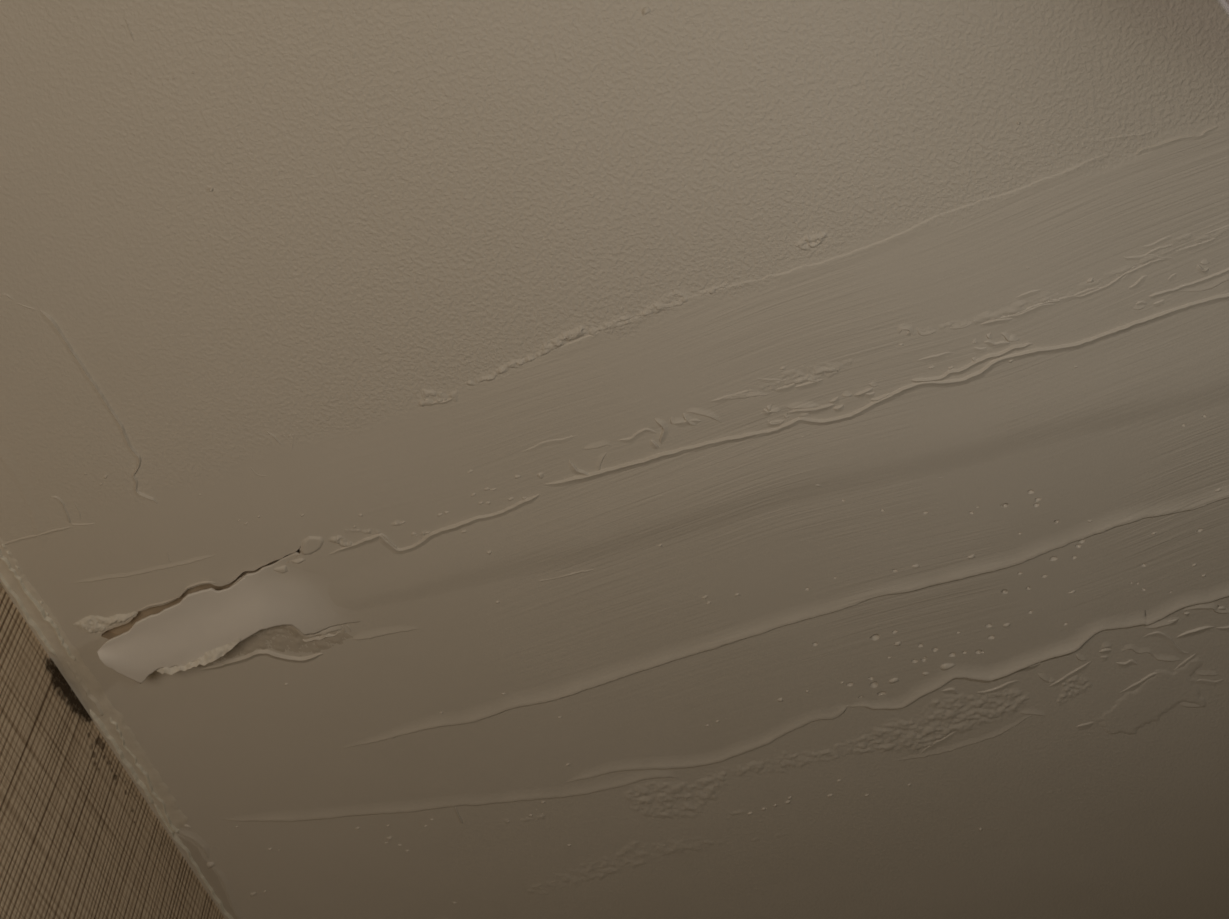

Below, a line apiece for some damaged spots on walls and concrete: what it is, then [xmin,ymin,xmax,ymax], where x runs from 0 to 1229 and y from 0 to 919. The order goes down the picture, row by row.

peeling [73,536,422,684]
leakage [46,659,137,823]